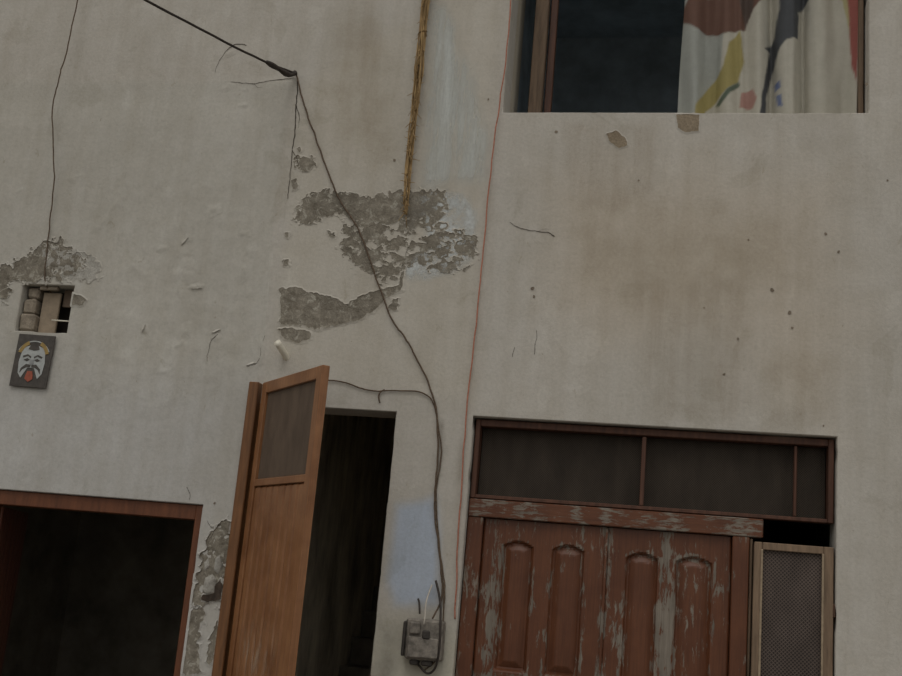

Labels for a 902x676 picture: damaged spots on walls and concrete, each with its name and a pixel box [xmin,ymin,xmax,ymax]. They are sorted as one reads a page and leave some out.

spalling [605,129,629,150]
spalling [675,113,701,134]
spalling [0,236,104,308]
flaking render [276,154,480,345]
spalling [180,515,231,676]